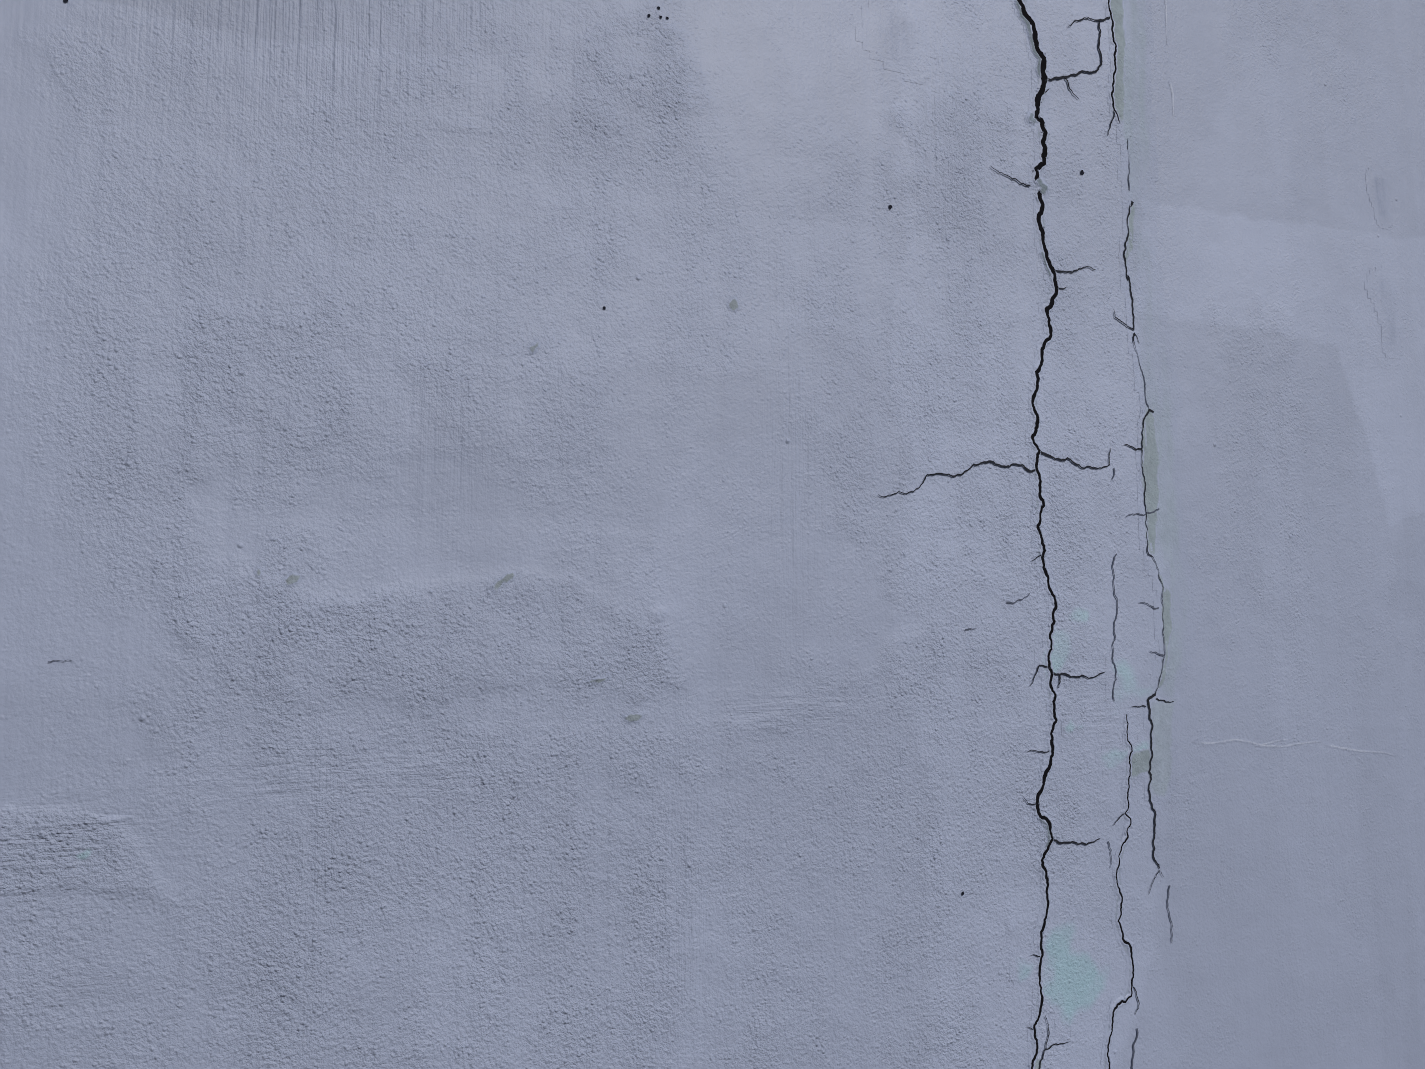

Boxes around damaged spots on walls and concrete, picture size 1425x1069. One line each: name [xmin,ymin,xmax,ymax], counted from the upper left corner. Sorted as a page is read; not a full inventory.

crack [878,0,1174,1069]